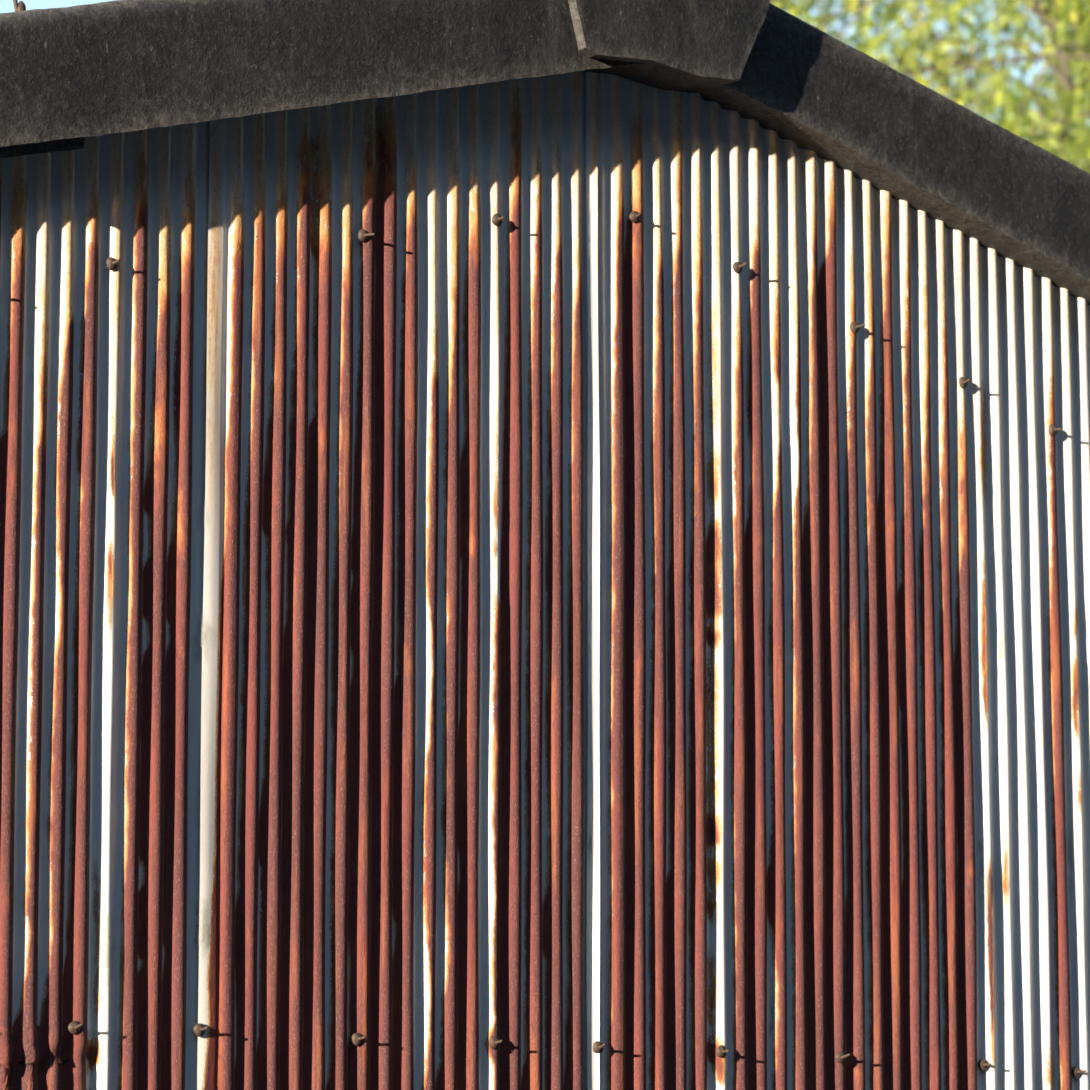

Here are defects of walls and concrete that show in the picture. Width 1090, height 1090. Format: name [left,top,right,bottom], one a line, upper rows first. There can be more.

rust [0,170,114,1090]
rust [118,160,196,1090]
rust [202,89,584,1090]
rust [607,120,1009,1090]
rust [1046,350,1081,1090]